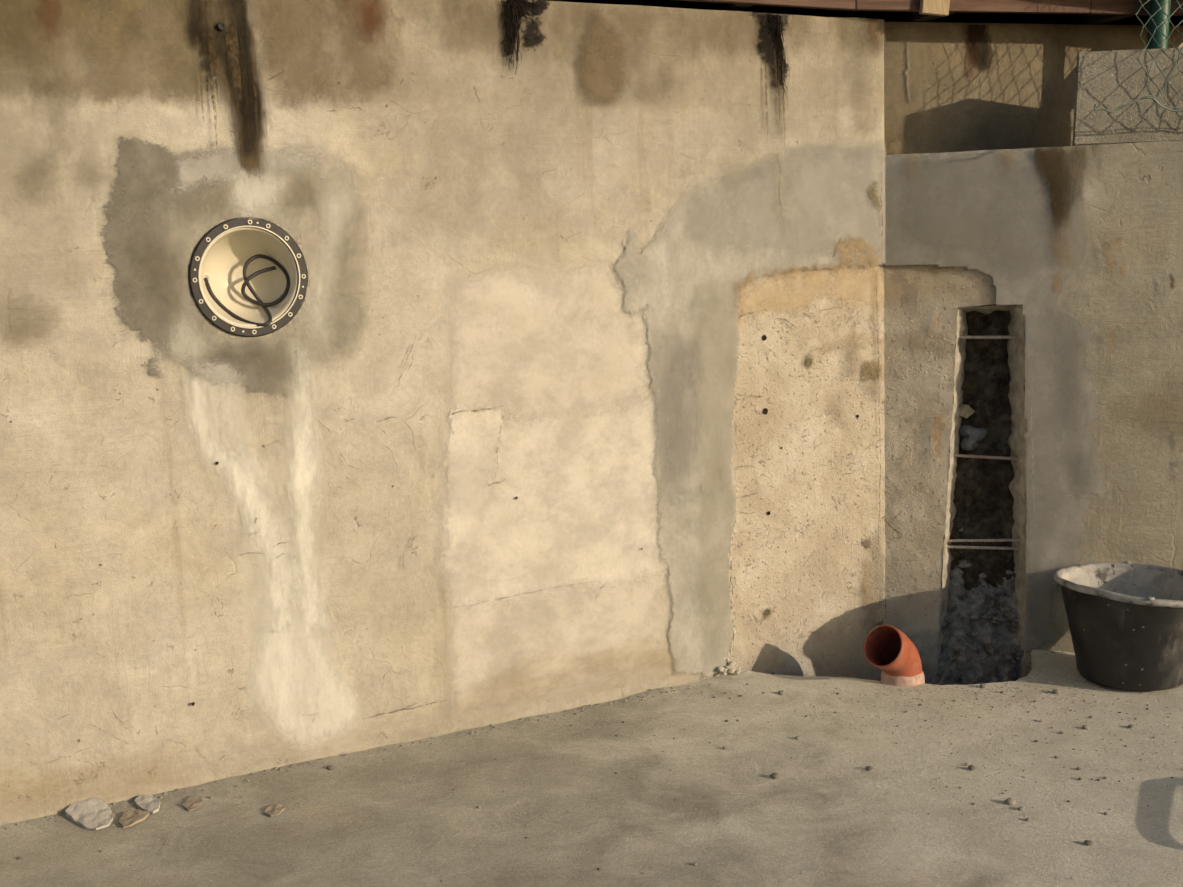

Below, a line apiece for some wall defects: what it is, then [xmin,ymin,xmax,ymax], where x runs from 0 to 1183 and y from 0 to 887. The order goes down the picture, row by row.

damp [0,0,143,79]
damp [160,0,391,172]
damp [480,0,549,75]
damp [751,12,793,130]
damp [1035,145,1097,226]
damp [101,136,355,737]
spalling [726,264,1026,681]